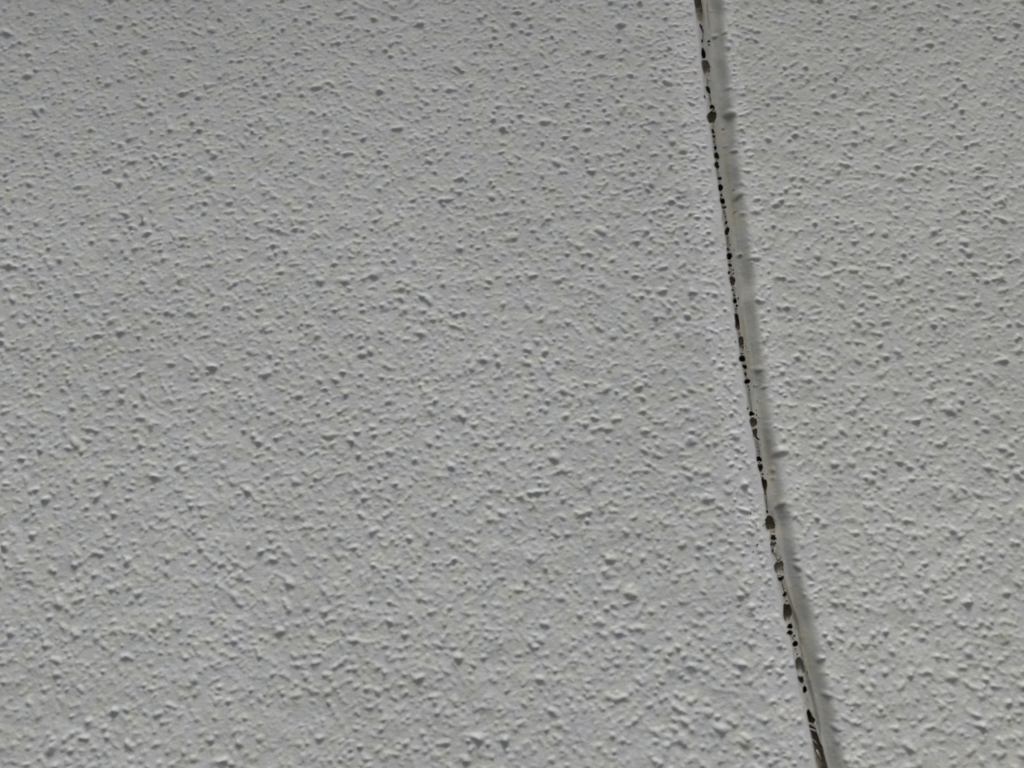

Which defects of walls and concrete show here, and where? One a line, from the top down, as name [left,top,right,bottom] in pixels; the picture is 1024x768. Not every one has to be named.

crack [693,0,809,704]